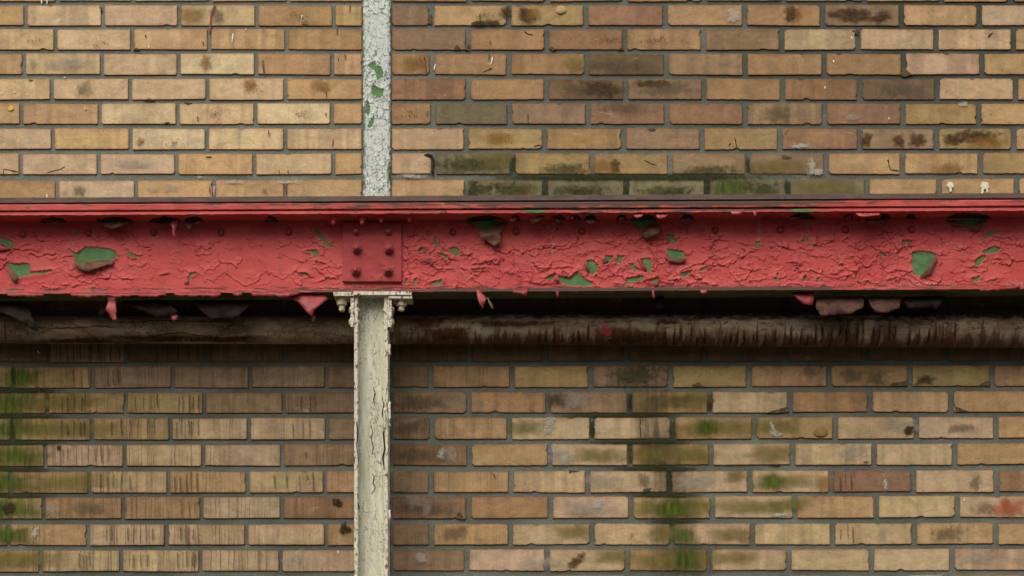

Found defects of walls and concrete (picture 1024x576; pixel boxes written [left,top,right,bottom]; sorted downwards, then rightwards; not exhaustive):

peeling [367,62,384,128]
peeling [69,247,138,272]
peeling [547,213,707,299]
peeling [902,241,937,277]
peeling [946,212,1020,291]
peeling [70,272,328,322]
peeling [792,276,945,316]
corrosion [481,321,589,345]
corrosion [609,320,706,345]
corrosion [723,319,956,347]
crack [356,389,386,510]
water stain [543,366,696,497]